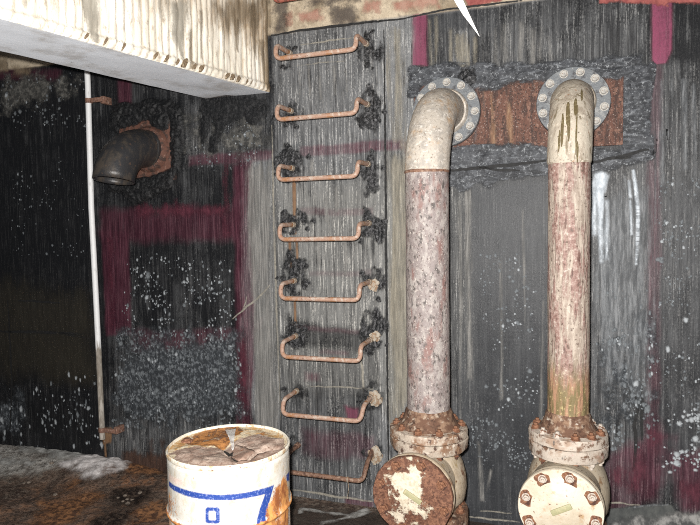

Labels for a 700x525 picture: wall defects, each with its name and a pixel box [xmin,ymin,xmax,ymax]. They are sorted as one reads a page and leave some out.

damp [82,0,99,43]
damp [170,0,194,69]
damp [217,0,263,50]
damp [112,253,246,431]
damp [596,219,700,451]
damp [0,282,126,477]
damp [662,403,700,473]